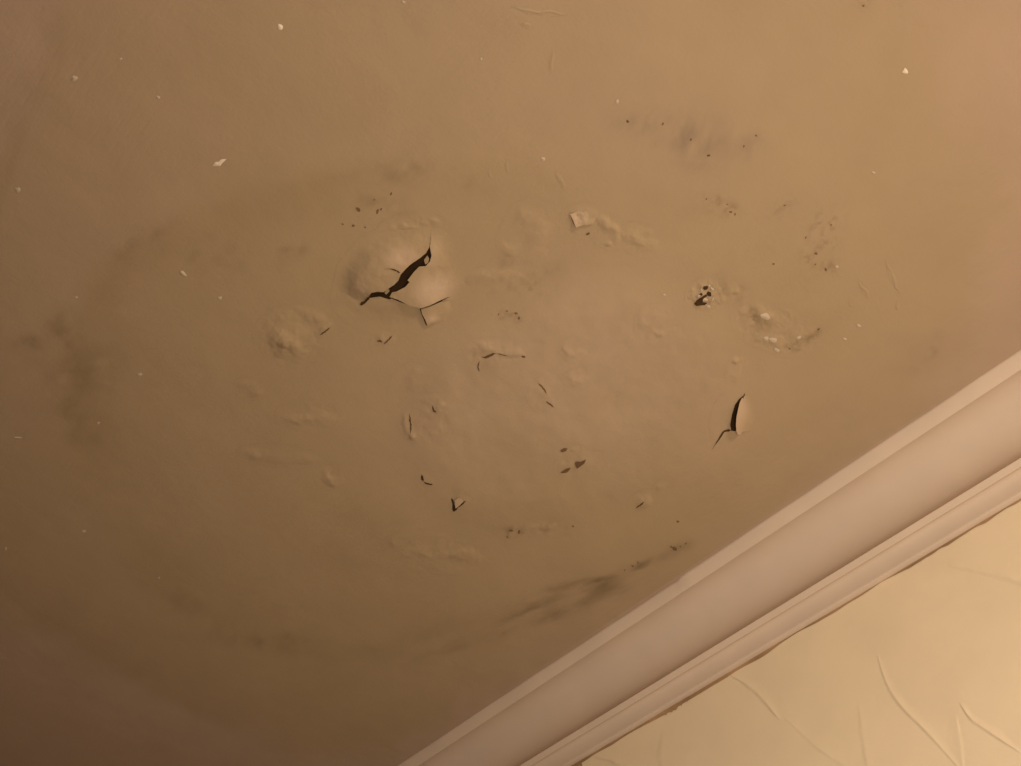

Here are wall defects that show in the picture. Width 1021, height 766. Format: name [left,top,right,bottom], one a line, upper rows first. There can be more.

leakage [0,0,75,225]
leakage [69,163,349,337]
leakage [794,196,851,280]
spalling [684,276,728,315]
leakage [1,300,140,453]
peeling [709,392,759,448]
leakage [63,430,123,506]
leakage [108,521,291,634]
leakage [152,577,326,663]
leakage [315,599,529,673]
leakage [402,550,672,670]
leakage [658,532,703,561]